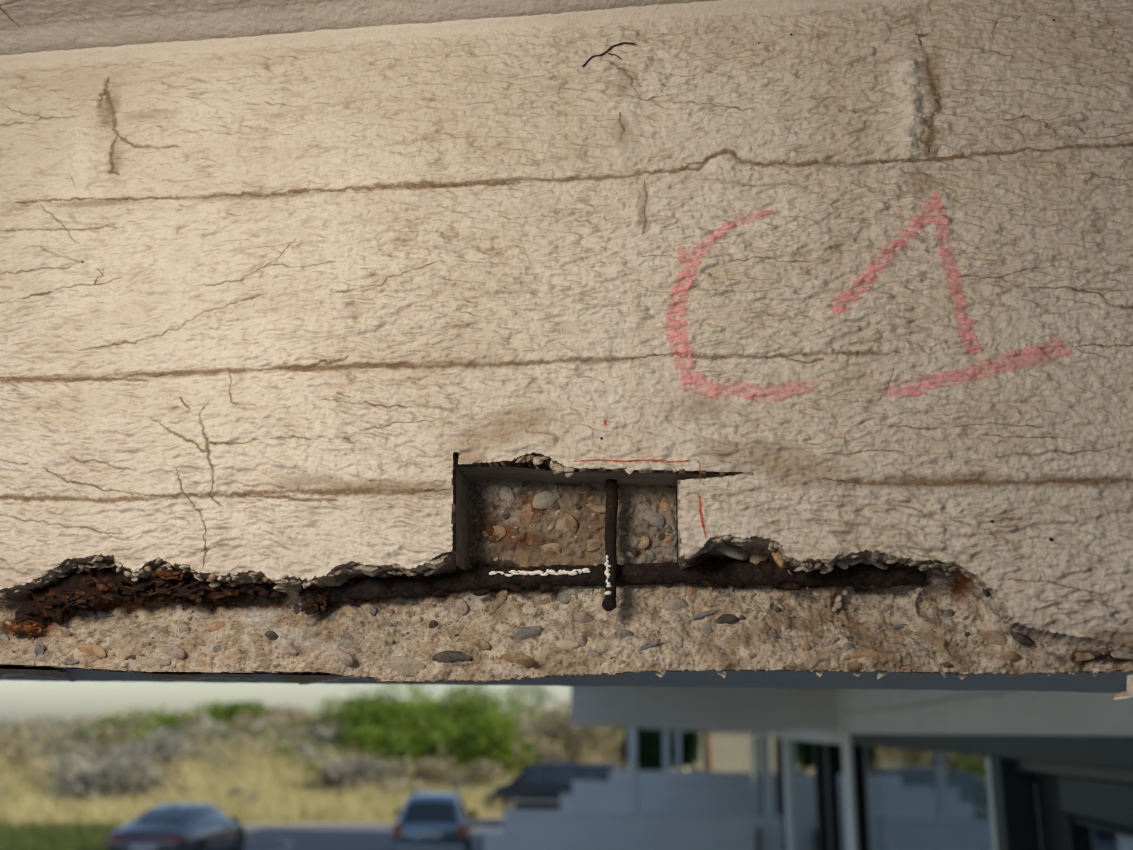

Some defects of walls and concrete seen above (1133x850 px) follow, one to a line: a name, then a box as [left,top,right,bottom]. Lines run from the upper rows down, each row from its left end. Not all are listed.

spalling [0,452,1133,700]